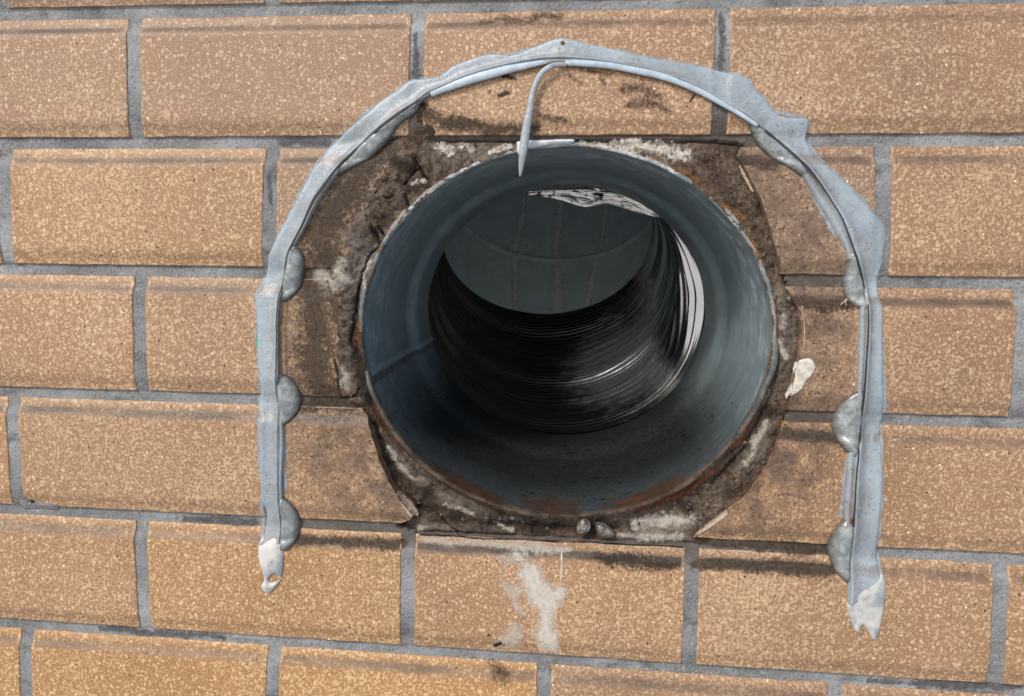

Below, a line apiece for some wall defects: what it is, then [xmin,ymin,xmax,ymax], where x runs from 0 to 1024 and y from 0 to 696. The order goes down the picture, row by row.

corrosion [617,467,719,511]
damp [423,537,572,651]